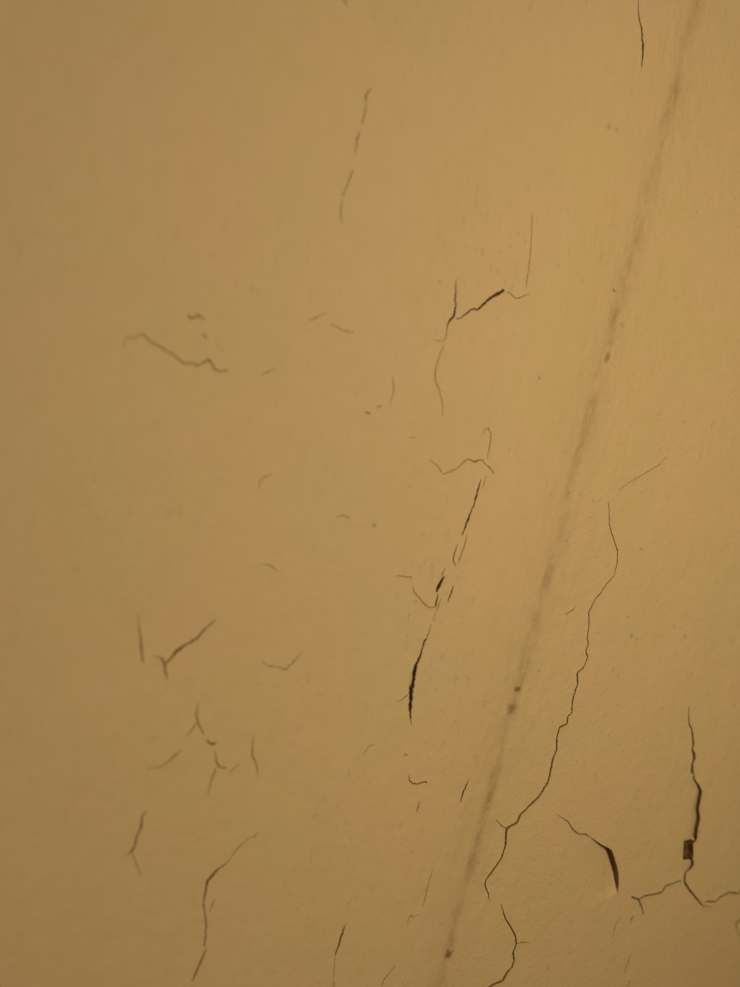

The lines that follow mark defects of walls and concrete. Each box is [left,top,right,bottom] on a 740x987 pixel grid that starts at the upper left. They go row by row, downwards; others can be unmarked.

crack [637,0,645,68]
crack [124,314,228,372]
crack [434,213,533,413]
crack [393,427,494,725]
crack [138,616,215,678]
crack [484,457,666,987]
peeling [679,707,704,907]
crack [125,811,146,874]
crack [192,834,257,981]
crack [612,880,682,937]
crack [704,890,740,908]